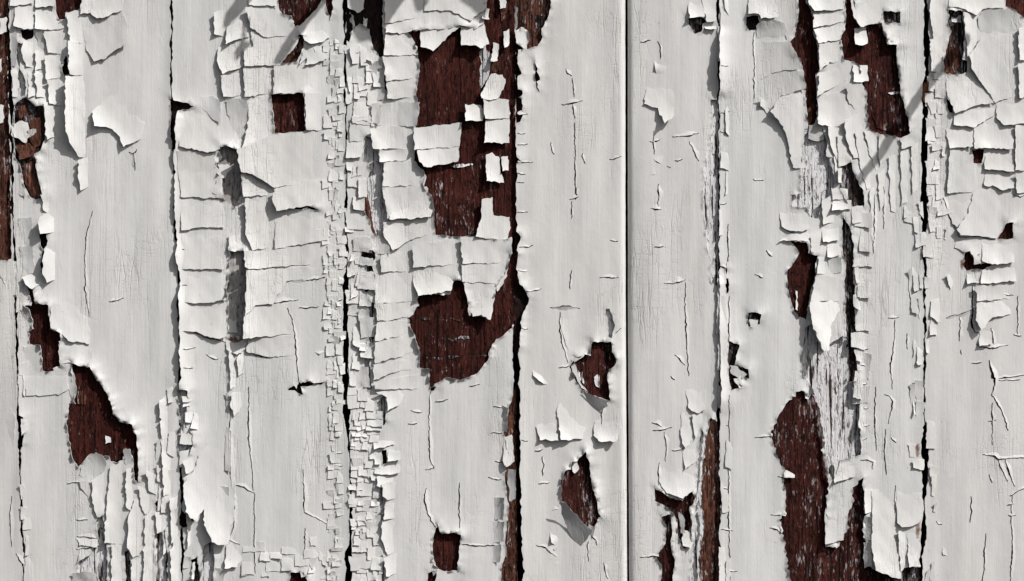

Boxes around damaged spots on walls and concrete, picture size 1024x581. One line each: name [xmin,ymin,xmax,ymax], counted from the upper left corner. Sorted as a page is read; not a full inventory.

peeling [0,0,551,581]
peeling [546,452,601,566]
peeling [536,309,621,442]
peeling [655,100,749,581]
peeling [746,0,1024,581]